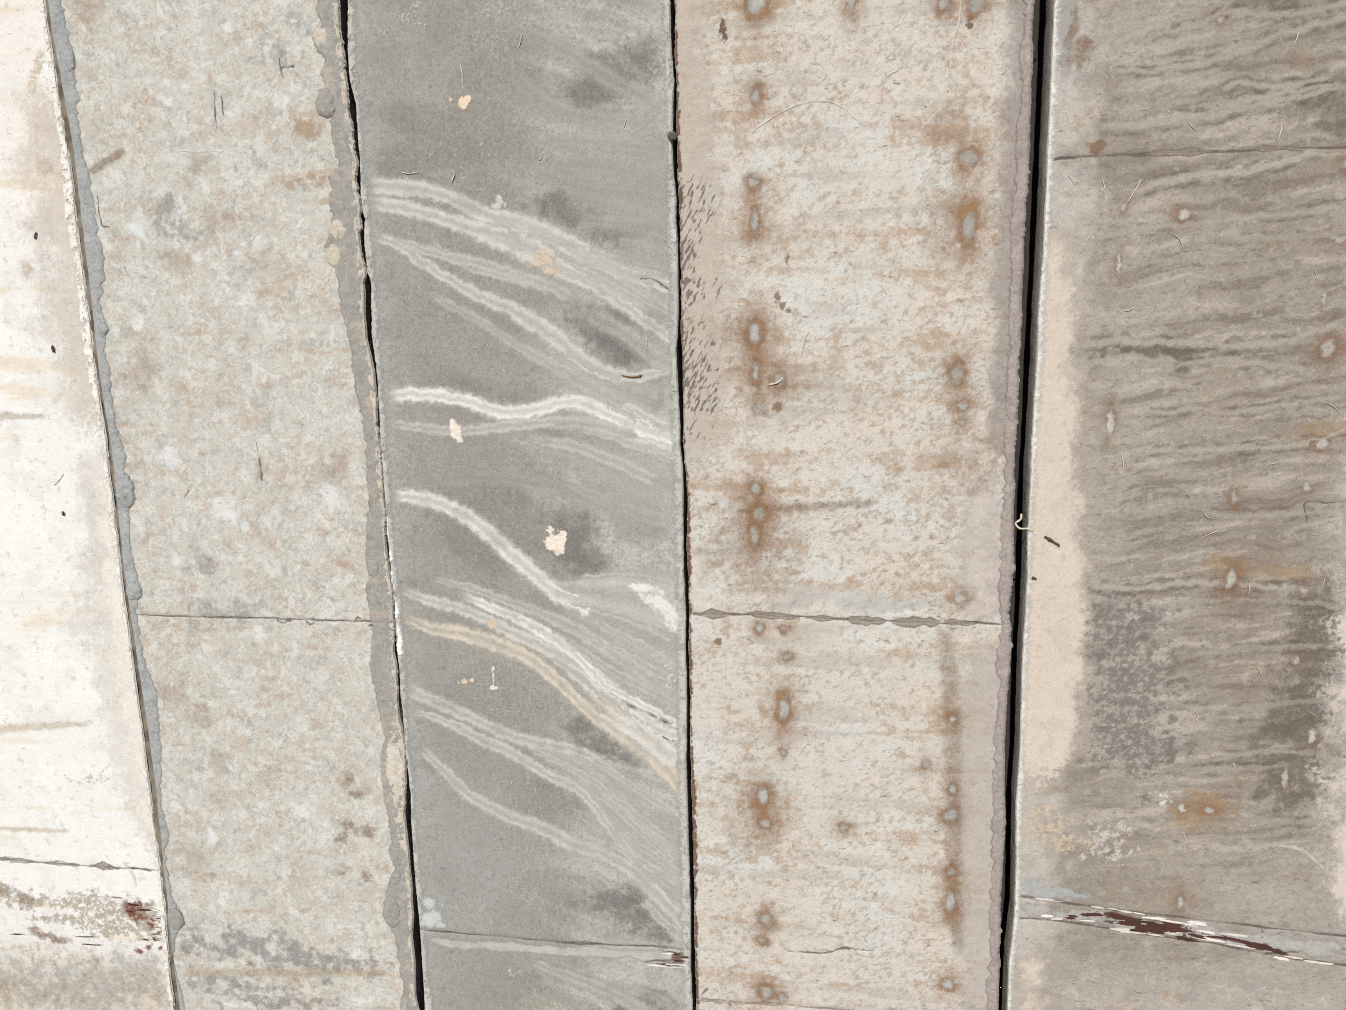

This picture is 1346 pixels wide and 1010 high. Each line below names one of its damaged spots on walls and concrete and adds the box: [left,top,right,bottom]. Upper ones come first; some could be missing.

rust [744,0,773,21]
damp [1118,2,1346,74]
damp [1109,77,1339,130]
damp [1137,151,1312,194]
rust [956,196,980,257]
rust [743,316,786,411]
rust [747,480,773,552]
damp [1017,233,1337,803]
rust [773,689,794,731]
damp [1142,415,1346,934]
peeling [0,591,174,1010]
spalling [1035,898,1334,965]